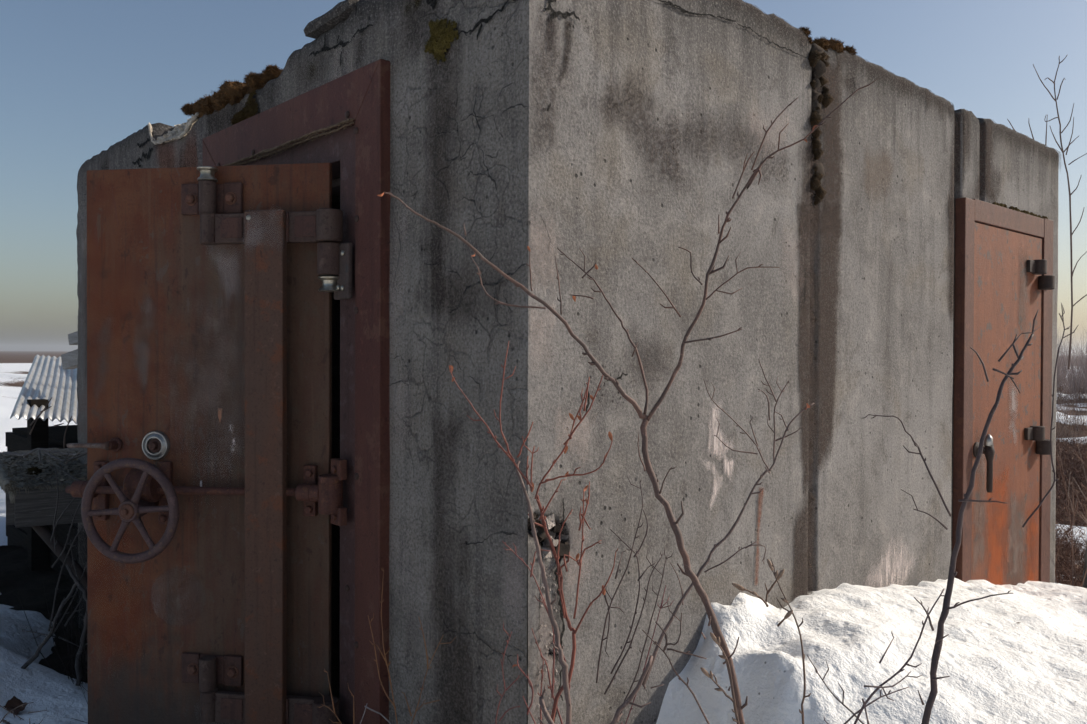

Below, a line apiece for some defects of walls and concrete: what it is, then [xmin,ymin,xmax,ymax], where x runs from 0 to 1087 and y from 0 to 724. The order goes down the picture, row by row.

crack [309,6,373,66]
crack [458,0,516,39]
crack [545,0,580,22]
crack [658,0,810,61]
crack [132,138,154,167]
spalling [148,112,199,145]
crack [394,73,551,240]
leakage [605,83,684,187]
leakage [926,89,1060,315]
leakage [793,60,855,601]
leakage [709,411,733,475]
spalling [527,512,570,720]